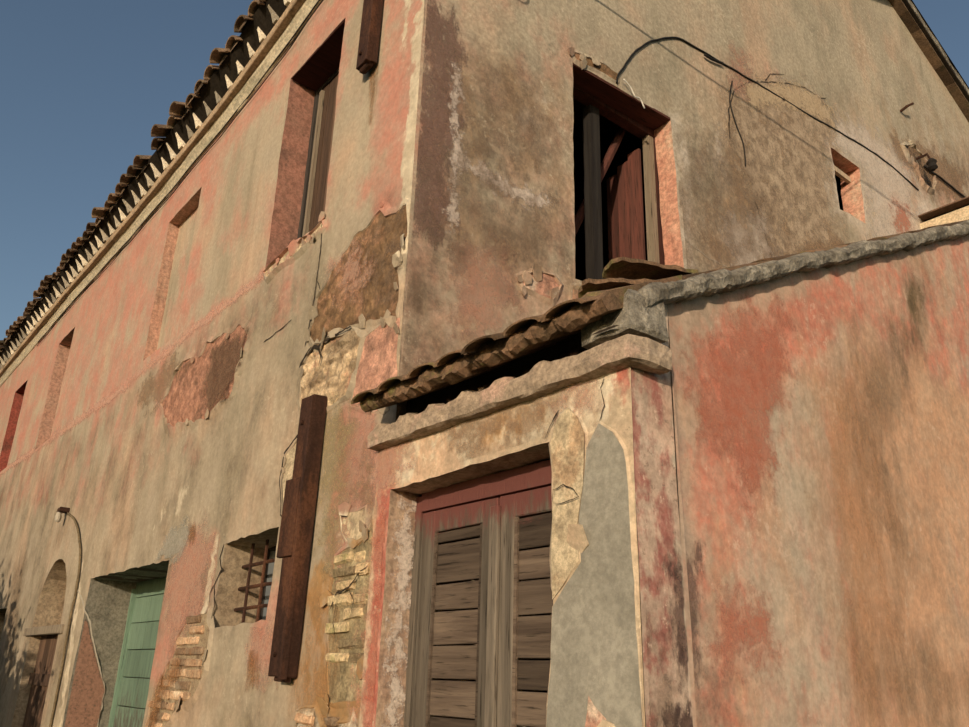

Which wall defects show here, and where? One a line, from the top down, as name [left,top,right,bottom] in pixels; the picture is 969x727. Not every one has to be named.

peeling [160,317,253,439]
spalling [263,211,328,285]
spalling [297,198,411,417]
leakage [413,0,552,250]
spalling [568,47,620,85]
peeling [718,73,937,266]
peeling [64,590,105,727]
flaking render [145,532,215,727]
flaking render [289,502,386,727]
peeling [548,404,589,607]
spalling [599,421,645,727]
leakage [668,543,702,690]